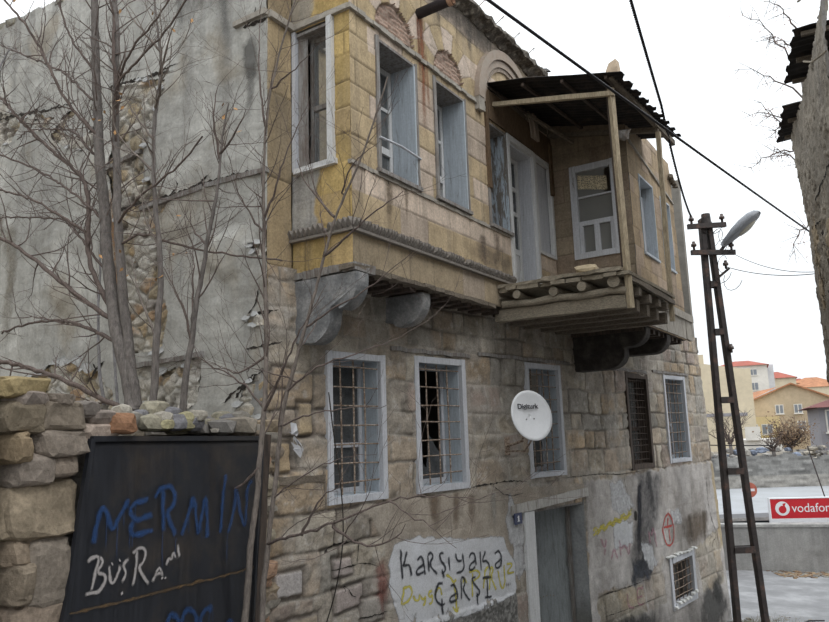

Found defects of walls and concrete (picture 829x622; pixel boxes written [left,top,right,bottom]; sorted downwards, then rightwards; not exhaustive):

corrosion [417,18,429,105]
spalling [0,111,94,151]
spalling [108,77,168,356]
crack [815,164,829,265]
spalling [27,356,113,410]
spalling [136,359,201,408]
leakage [638,472,653,544]
leakage [701,577,727,622]